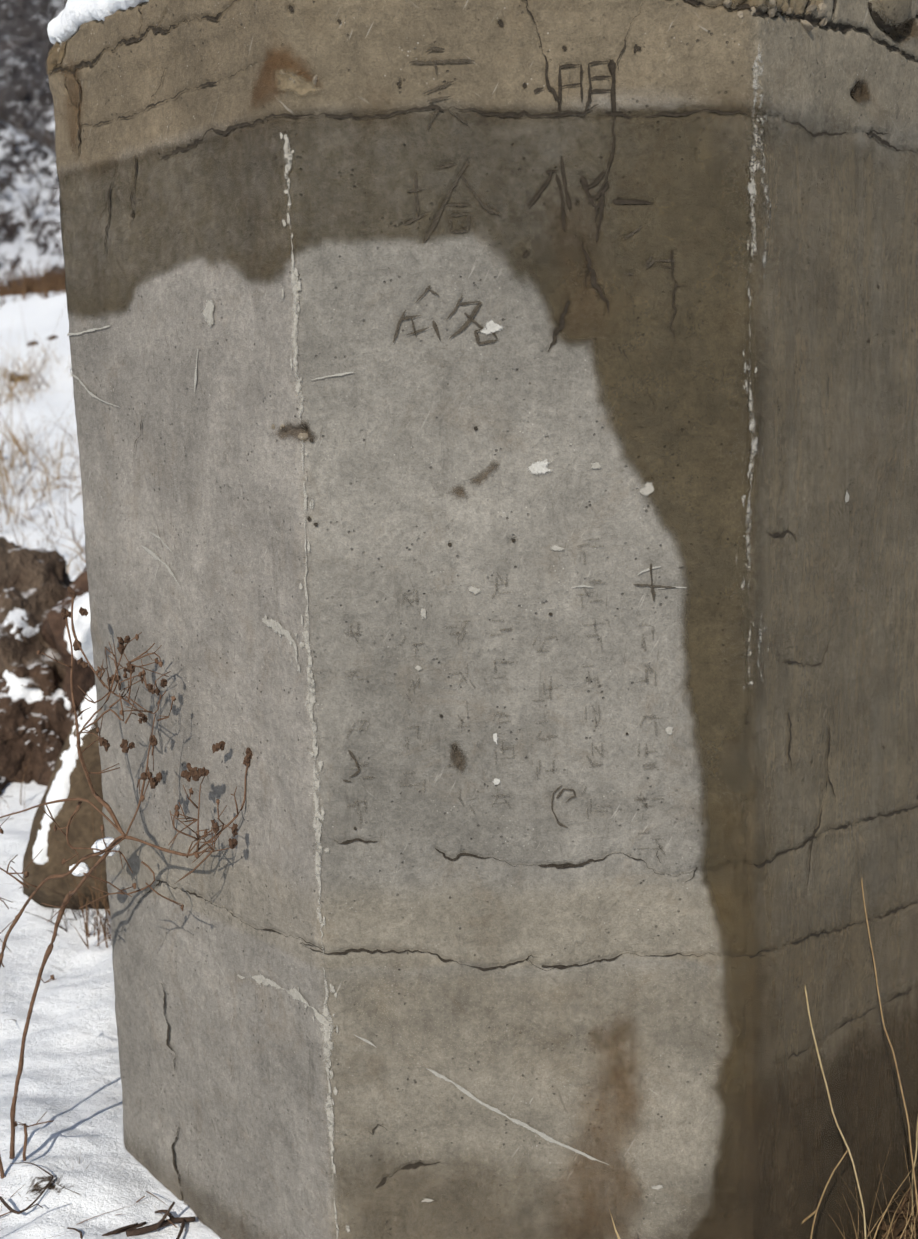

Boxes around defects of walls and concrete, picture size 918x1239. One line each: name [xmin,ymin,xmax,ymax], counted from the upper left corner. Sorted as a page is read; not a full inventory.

crack [50,0,265,161]
rust [254,52,311,99]
spalling [723,0,828,32]
spalling [883,18,918,42]
crack [99,0,918,352]
leakage [57,107,847,1239]
leakage [708,104,918,1239]
crack [787,711,797,771]
crack [338,837,377,845]
crack [435,727,918,897]
crack [138,880,918,971]